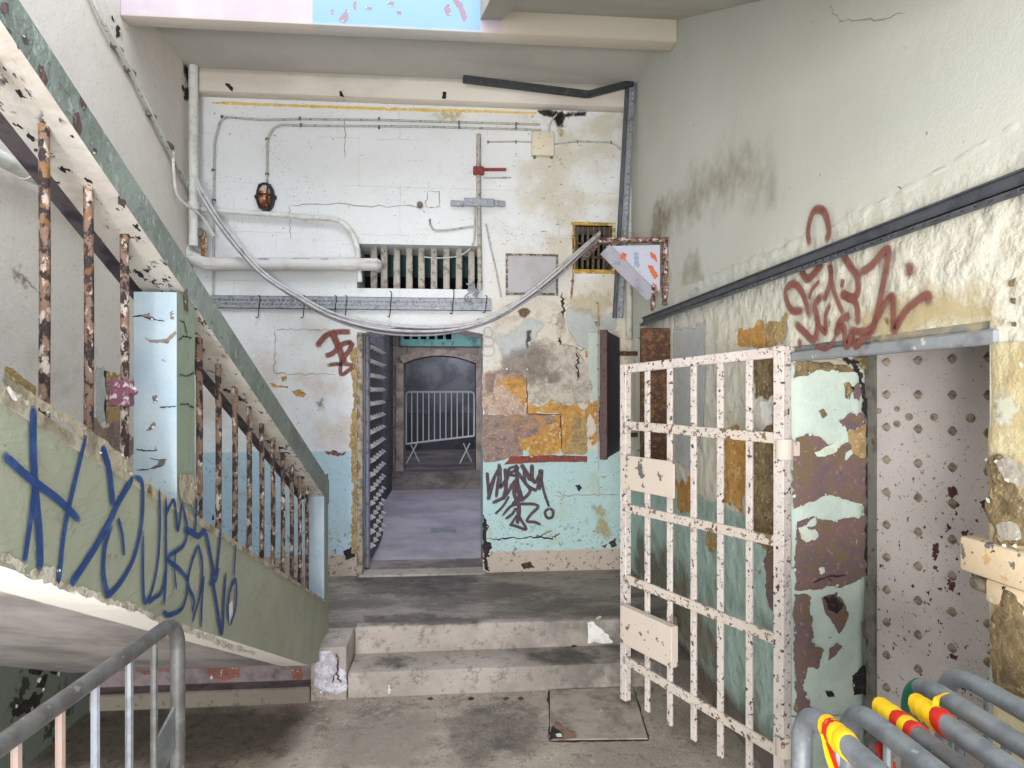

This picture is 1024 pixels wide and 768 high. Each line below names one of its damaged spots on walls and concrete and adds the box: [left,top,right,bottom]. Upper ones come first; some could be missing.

crack [830,6,905,23]
peeling [146,289,189,344]
crack [556,295,585,381]
spalling [3,367,134,477]
crack [487,531,560,541]
flaking render [481,312,600,462]
flaking render [724,312,787,611]
peeling [791,356,868,714]
flaking render [980,454,1024,548]
spalling [291,650,348,695]
flaking render [988,589,1024,698]